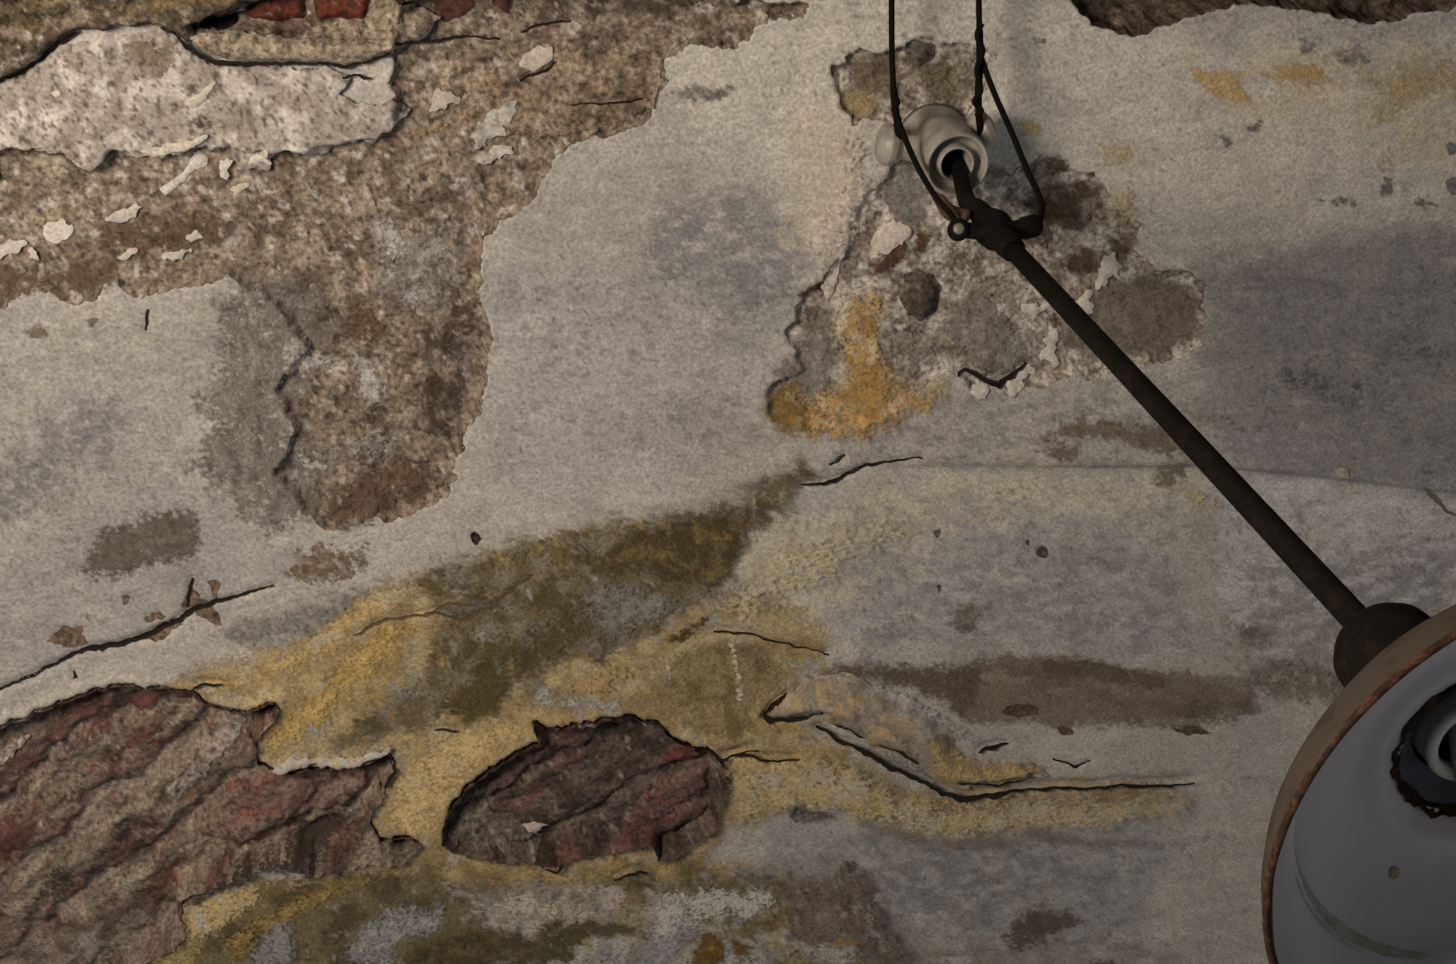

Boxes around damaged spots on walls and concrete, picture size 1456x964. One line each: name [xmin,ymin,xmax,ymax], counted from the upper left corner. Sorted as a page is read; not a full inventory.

crack [0,31,78,82]
crack [160,20,571,81]
crack [571,97,643,106]
flaking render [1071,0,1456,37]
flaking render [0,0,809,585]
flaking render [764,36,1206,437]
crack [1423,488,1456,516]
crack [0,577,274,690]
damp [146,289,1344,964]
spalling [0,683,421,964]
spalling [441,713,728,870]
crack [715,692,1195,803]